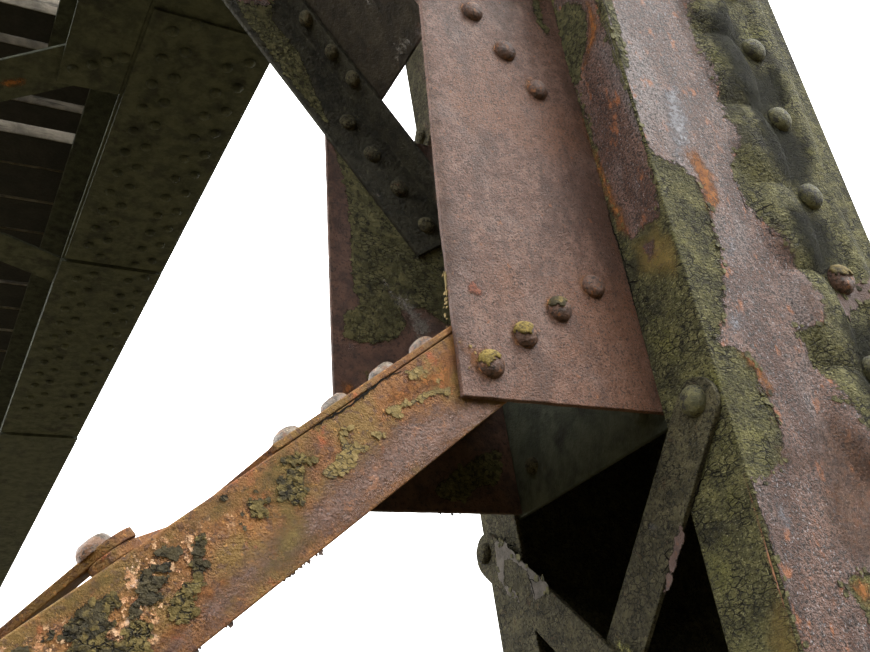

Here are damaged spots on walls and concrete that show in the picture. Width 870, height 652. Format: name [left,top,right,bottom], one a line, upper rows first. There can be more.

crack [691,467,708,509]
peeling [494,538,550,603]
rust [746,482,785,607]